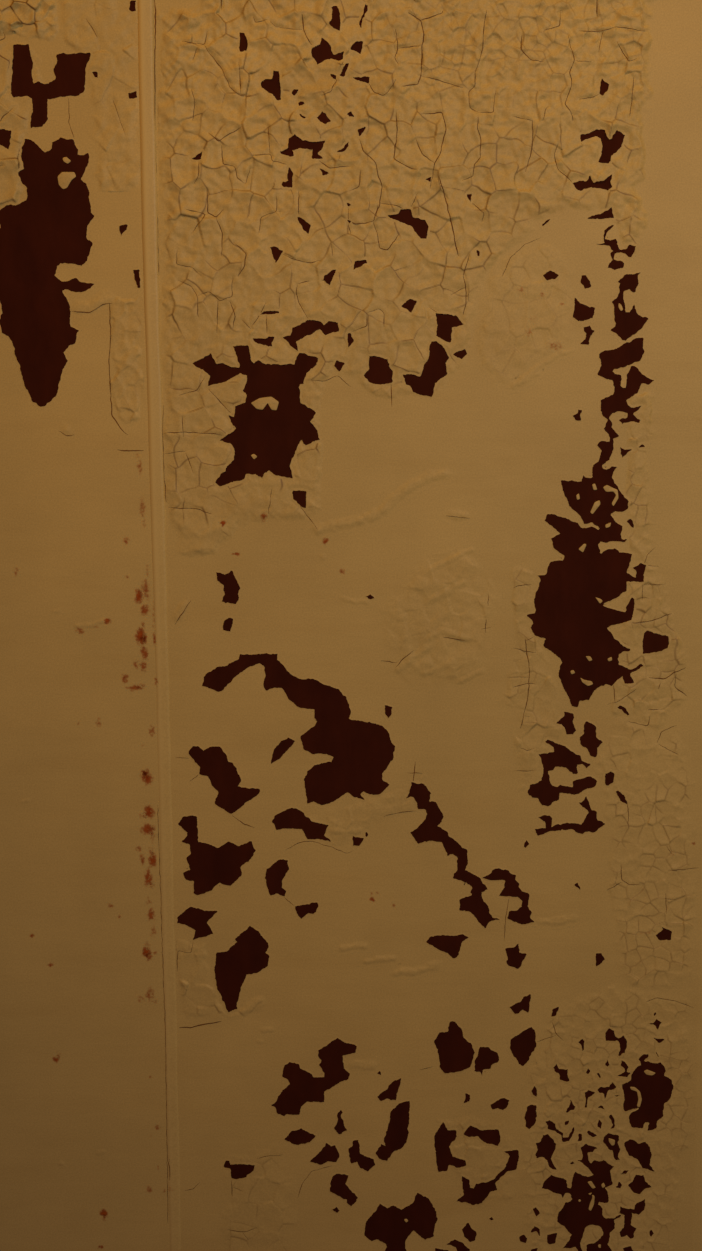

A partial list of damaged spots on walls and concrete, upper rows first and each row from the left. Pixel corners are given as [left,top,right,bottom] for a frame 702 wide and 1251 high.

peeling [0,0,140,410]
peeling [130,266,144,291]
crack [154,0,250,112]
crack [158,92,299,328]
crack [289,0,641,314]
peeling [157,0,698,972]
peeling [174,812,322,1014]
peeling [217,958,676,1251]